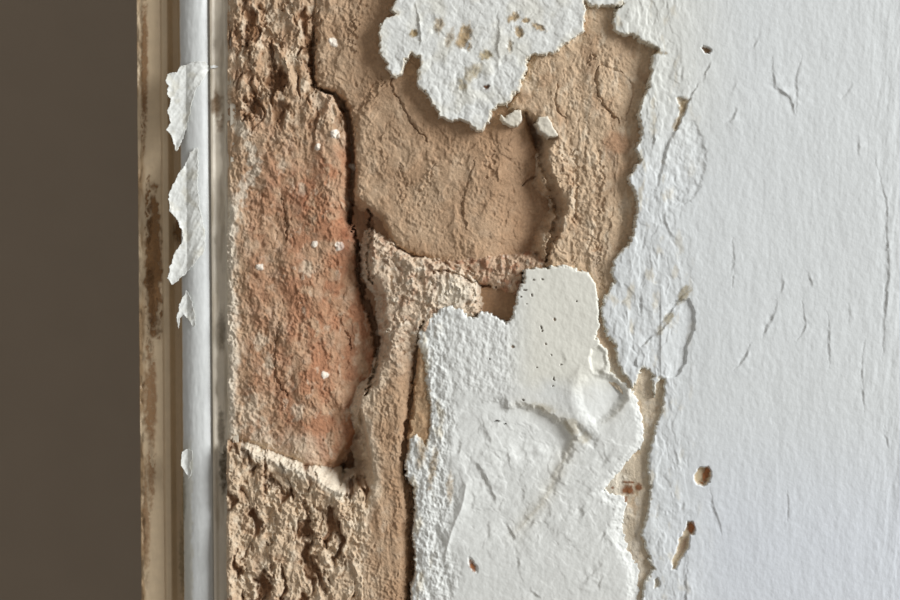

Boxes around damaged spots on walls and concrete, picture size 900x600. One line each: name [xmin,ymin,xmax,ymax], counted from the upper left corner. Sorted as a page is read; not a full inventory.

crack [317,85,357,228]
crack [390,78,428,144]
crack [460,157,476,218]
crack [521,84,567,265]
peeling [143,147,206,439]
crack [344,331,352,351]
flaking render [165,0,698,600]
crack [393,245,498,289]
crack [397,320,426,600]